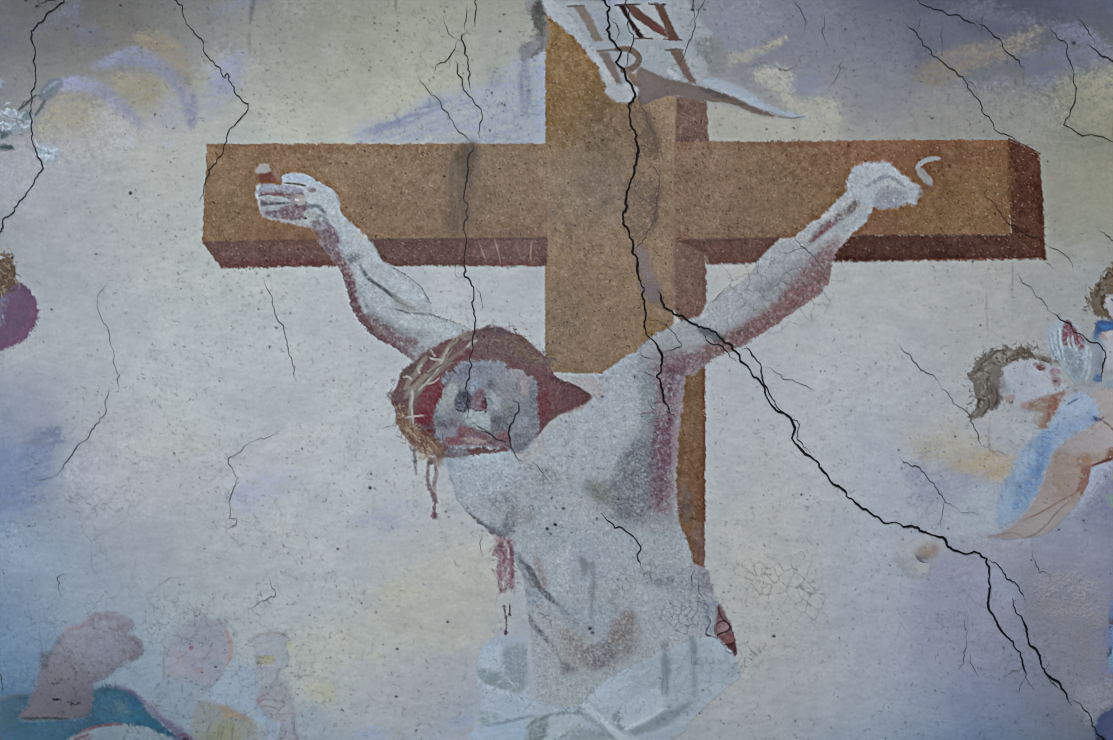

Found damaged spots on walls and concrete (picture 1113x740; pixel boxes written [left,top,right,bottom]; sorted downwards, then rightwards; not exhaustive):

crack [0,0,64,232]
crack [176,0,249,199]
crack [419,0,483,418]
crack [38,283,120,480]
crack [507,401,547,478]
crack [601,0,1113,740]